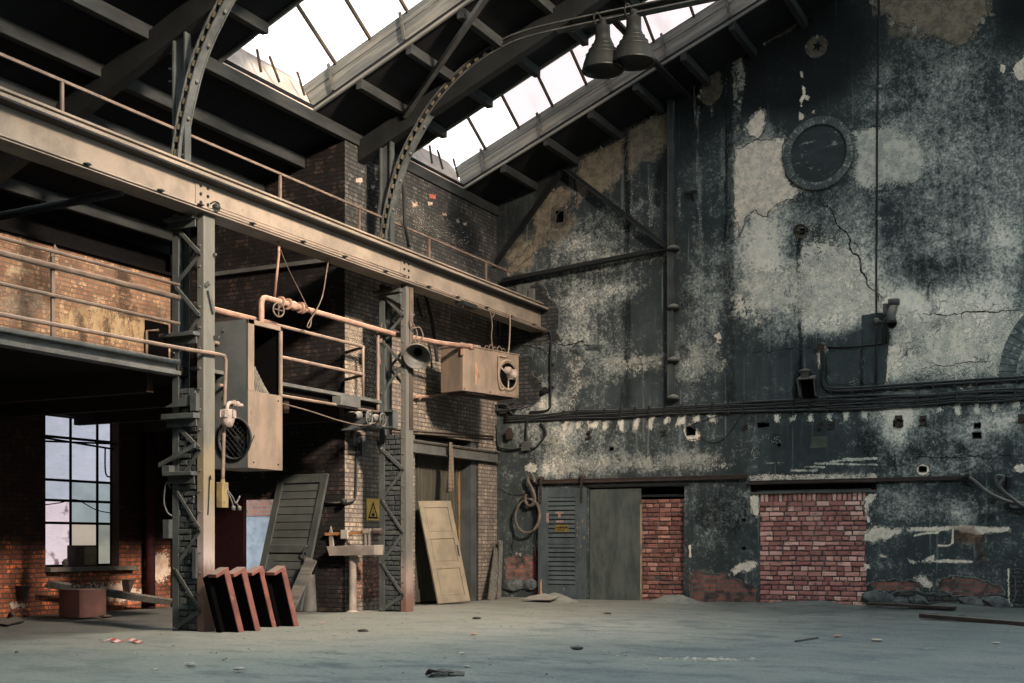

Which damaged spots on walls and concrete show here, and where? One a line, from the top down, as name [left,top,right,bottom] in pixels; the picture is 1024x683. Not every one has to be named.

flaking render [868,0,996,48]
flaking render [798,71,815,120]
flaking render [697,58,805,239]
flaking render [497,112,667,414]
crack [819,188,884,303]
crack [919,310,1020,318]
spalling [757,414,812,429]
flaking render [750,457,878,481]
spalling [687,546,760,602]
spalling [862,493,1024,607]